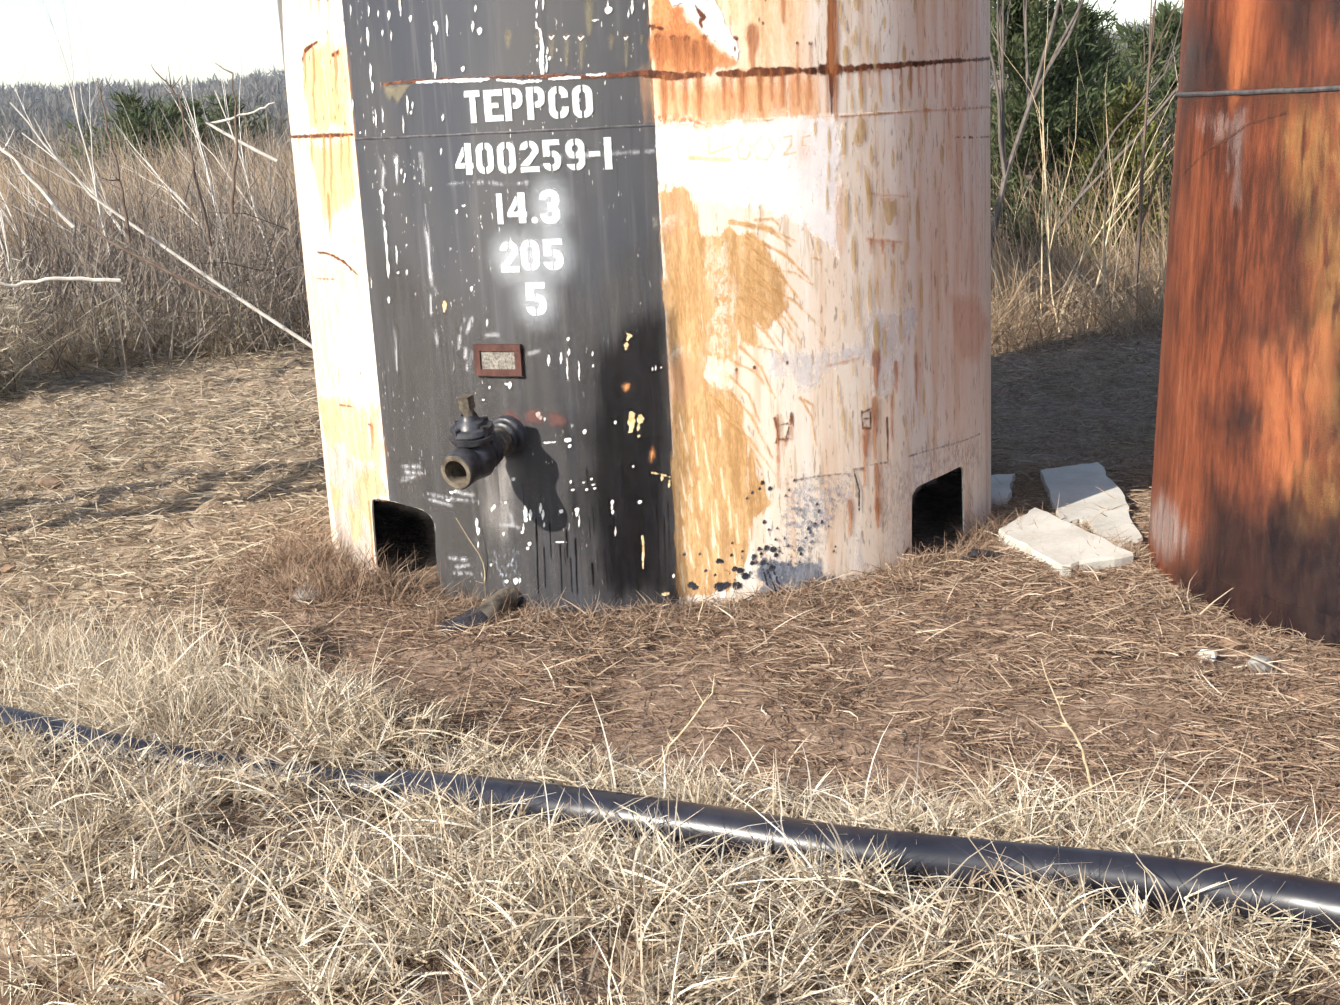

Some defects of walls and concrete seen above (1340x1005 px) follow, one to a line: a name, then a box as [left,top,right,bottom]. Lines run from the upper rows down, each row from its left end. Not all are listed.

peeling [366,0,412,46]
peeling [431,15,448,77]
peeling [592,0,645,22]
corrosion [381,0,991,127]
corrosion [1230,0,1256,90]
corrosion [290,0,388,570]
peeling [547,337,594,380]
peeling [614,411,644,438]
corrosion [1262,331,1327,484]
peeling [521,503,580,550]
peeling [662,471,851,596]